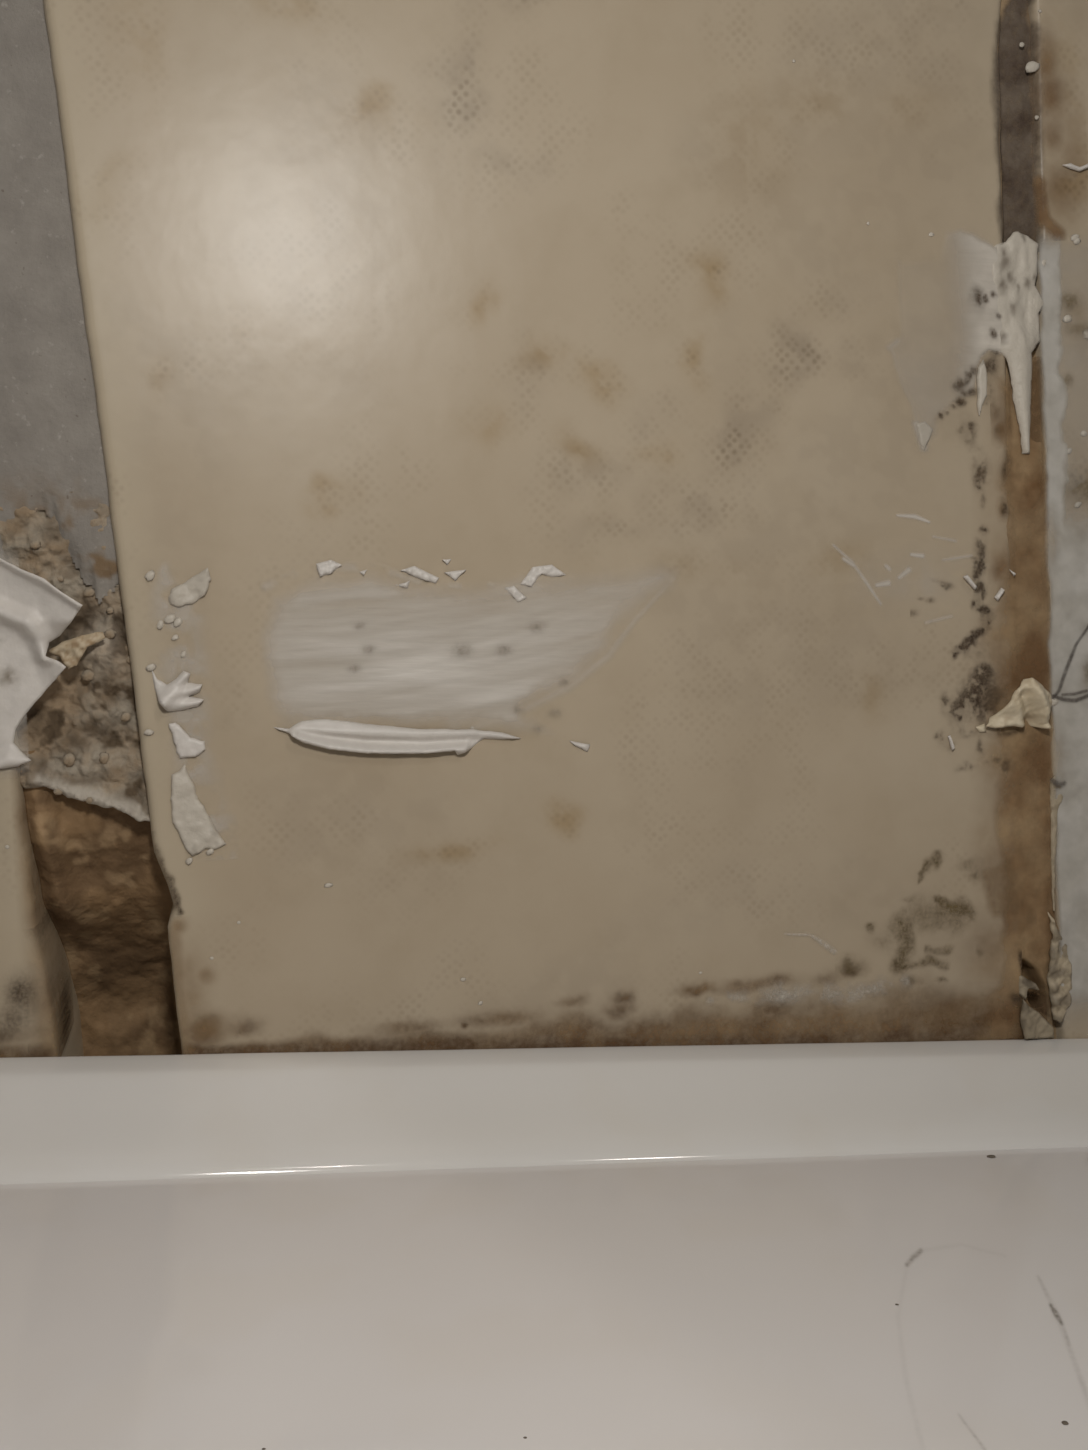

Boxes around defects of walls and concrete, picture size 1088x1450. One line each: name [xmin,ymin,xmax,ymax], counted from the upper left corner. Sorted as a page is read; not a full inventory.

damp [995,0,1064,250]
damp [940,316,1000,415]
damp [953,528,1016,657]
peeling [48,632,105,669]
damp [942,665,998,720]
peeling [975,677,1052,732]
damp [46,976,70,1057]